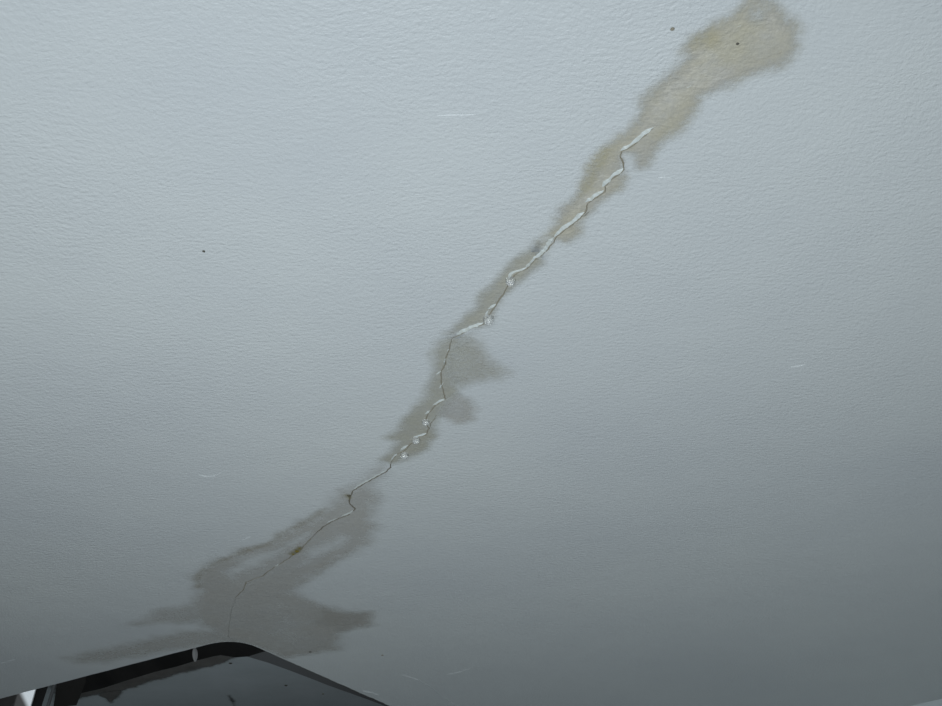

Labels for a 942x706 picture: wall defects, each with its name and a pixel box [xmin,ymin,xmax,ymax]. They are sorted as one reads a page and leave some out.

water stain [193,492,369,655]
crack [228,127,654,636]
water stain [384,0,796,462]